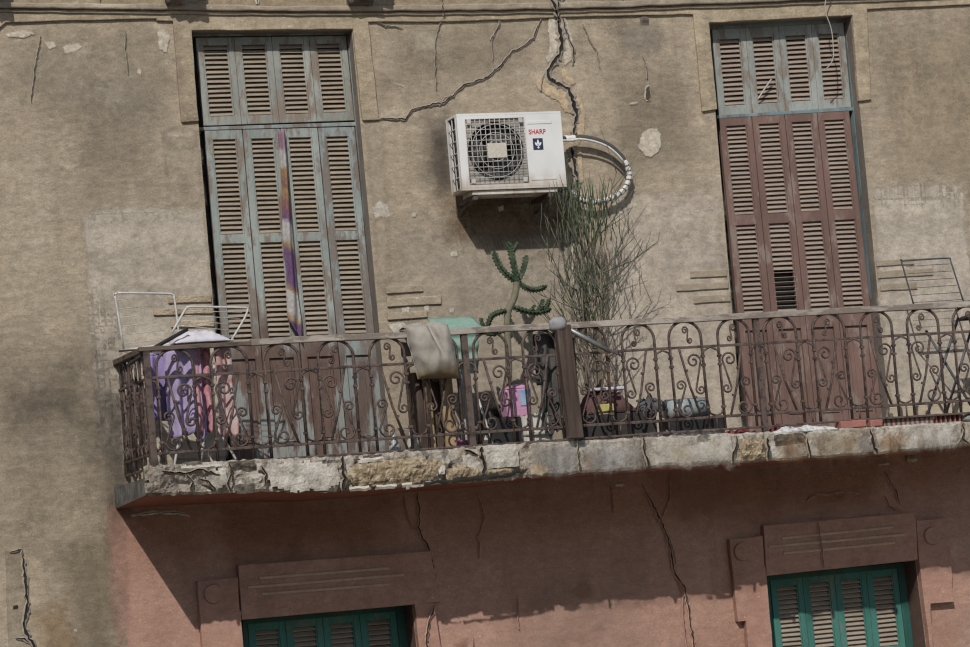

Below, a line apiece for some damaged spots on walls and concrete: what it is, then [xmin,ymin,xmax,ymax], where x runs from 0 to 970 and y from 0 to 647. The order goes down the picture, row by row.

crack [379,0,600,322]
peeling [638,128,661,157]
crack [10,548,36,647]
spalling [145,444,549,494]
crack [403,492,441,647]
crack [464,446,487,557]
crack [641,438,696,647]
spalling [737,433,805,461]